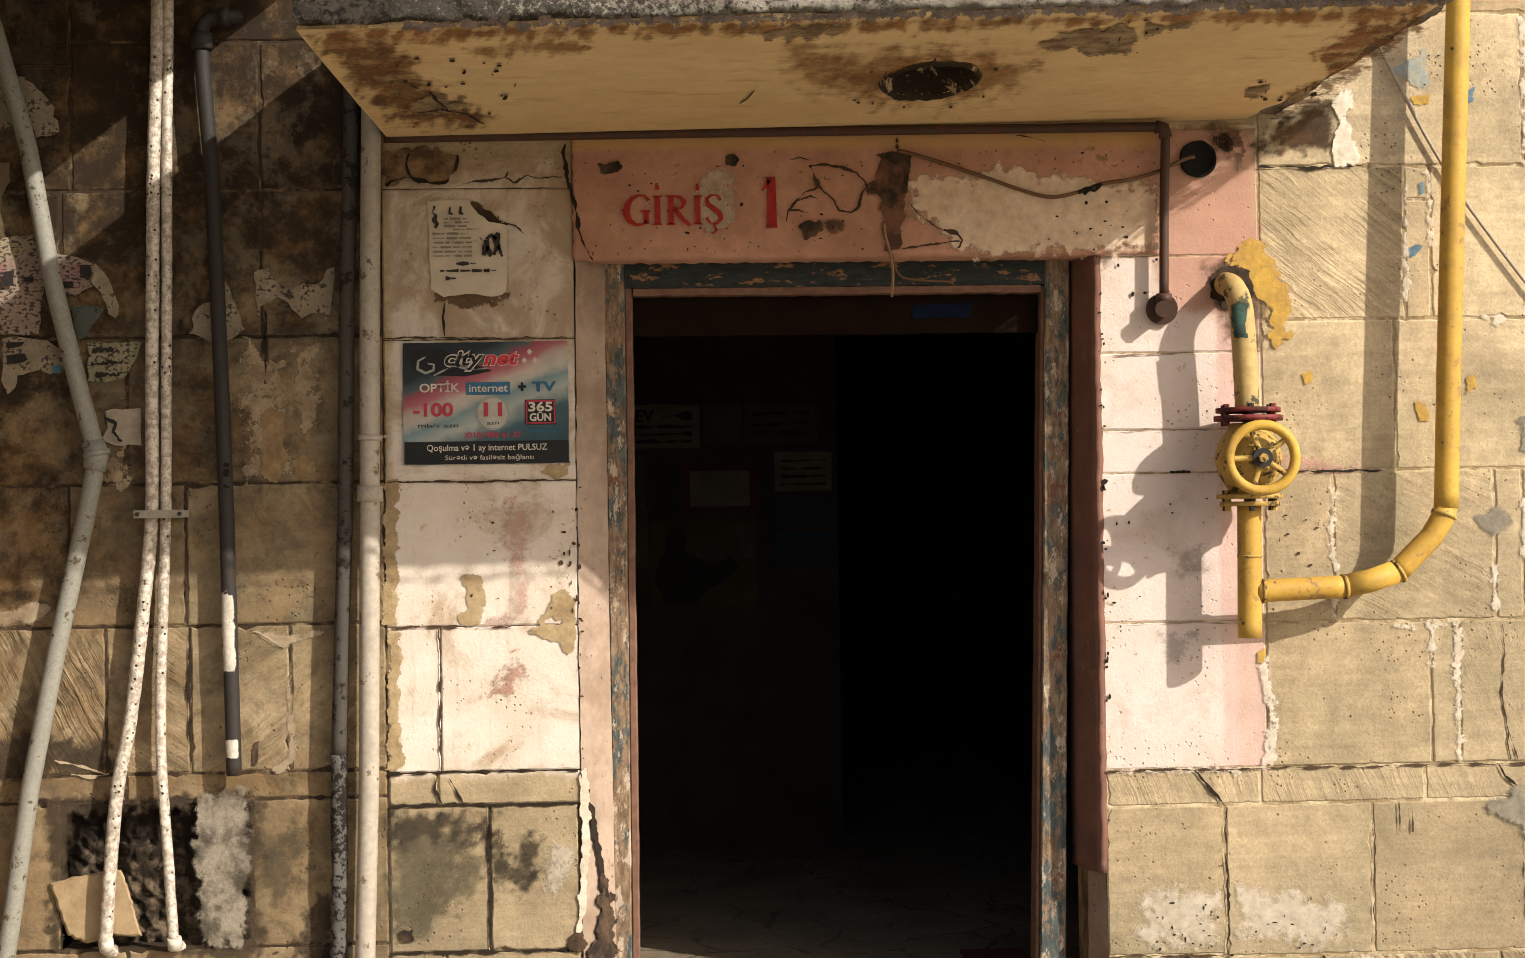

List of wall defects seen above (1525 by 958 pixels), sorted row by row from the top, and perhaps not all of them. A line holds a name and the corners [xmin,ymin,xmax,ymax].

peeling [743,22,848,44]
peeling [1038,19,1193,57]
spalling [852,57,998,108]
peeling [1244,81,1317,105]
crack [458,144,593,260]
crack [786,157,876,222]
hole [1209,265,1254,309]
peeling [442,574,499,627]
leakage [387,803,541,938]
spalling [568,873,618,958]